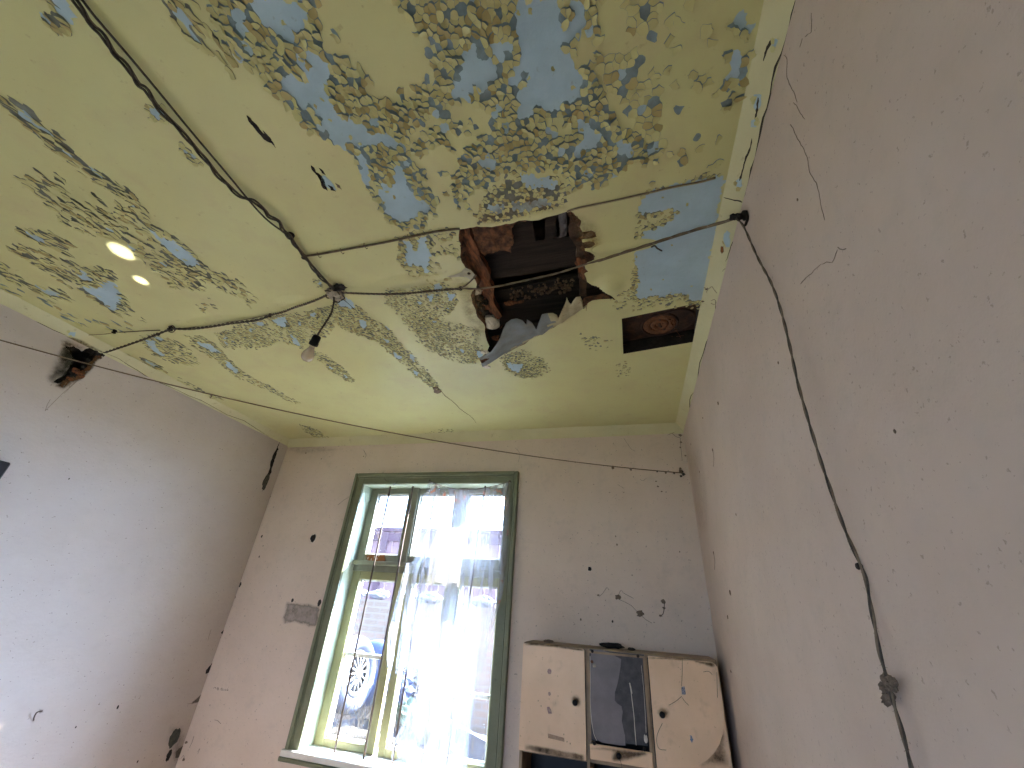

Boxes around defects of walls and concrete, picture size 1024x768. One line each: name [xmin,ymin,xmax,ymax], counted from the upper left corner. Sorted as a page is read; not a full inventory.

peeling [0,0,761,404]
crack [724,0,825,220]